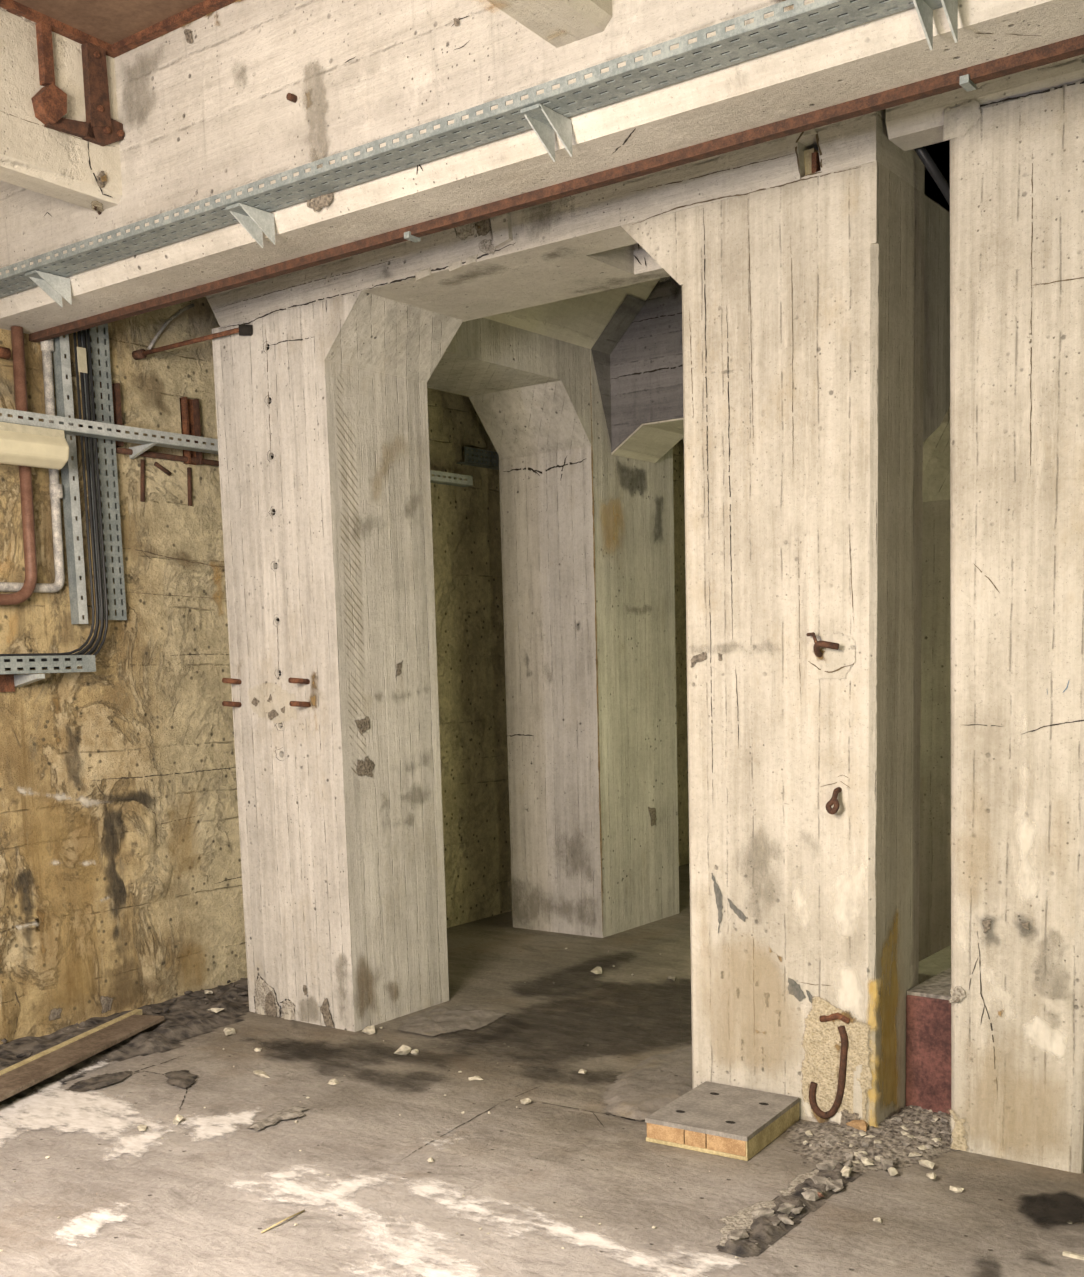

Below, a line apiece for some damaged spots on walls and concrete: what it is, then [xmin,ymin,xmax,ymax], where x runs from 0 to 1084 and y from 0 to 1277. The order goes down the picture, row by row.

damp [68,728,79,784]
damp [81,792,155,913]
spalling [254,974,307,1020]
spalling [320,998,334,1027]
damp [279,953,692,1082]
spalling [801,990,872,1127]
damp [0,1061,259,1161]
damp [56,1203,127,1246]
damp [228,1165,740,1277]